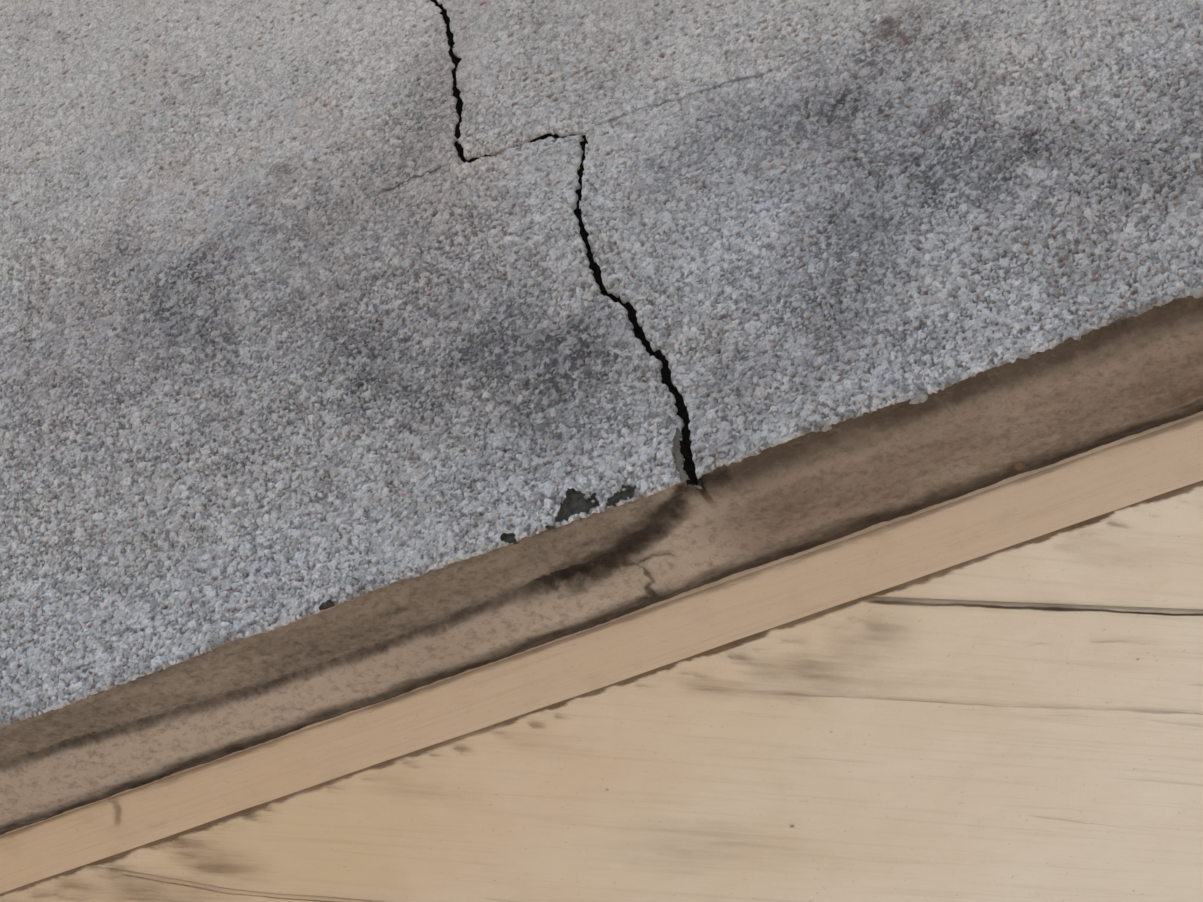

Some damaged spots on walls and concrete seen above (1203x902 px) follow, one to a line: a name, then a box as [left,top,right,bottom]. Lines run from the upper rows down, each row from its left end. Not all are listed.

crack [386,0,701,485]
spalling [545,479,636,530]
spalling [500,533,518,544]